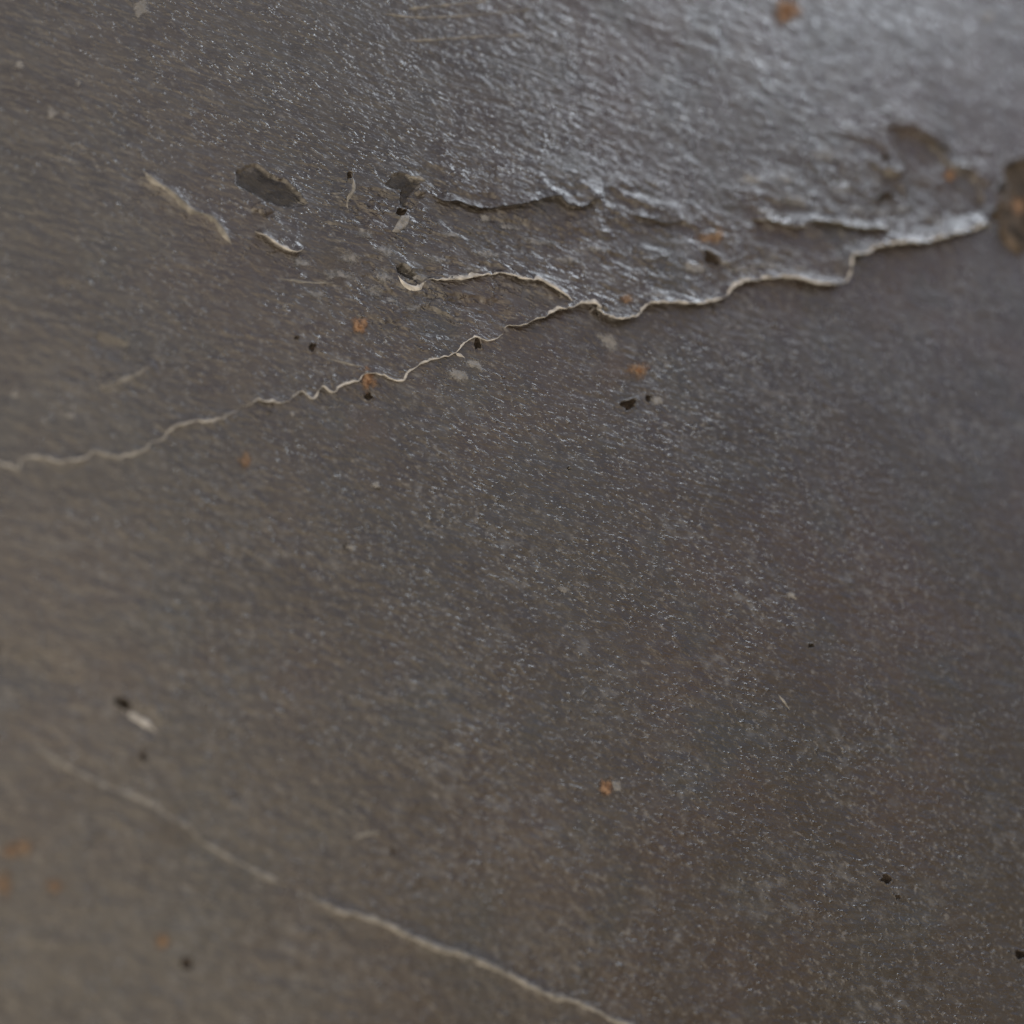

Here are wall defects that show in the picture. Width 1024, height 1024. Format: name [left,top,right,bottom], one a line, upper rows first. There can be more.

peeling [239,169,304,252]
peeling [389,174,606,233]
peeling [749,209,893,230]
peeling [884,115,1024,257]
peeling [397,266,427,281]
crack [33,746,281,883]
crack [306,894,634,1024]